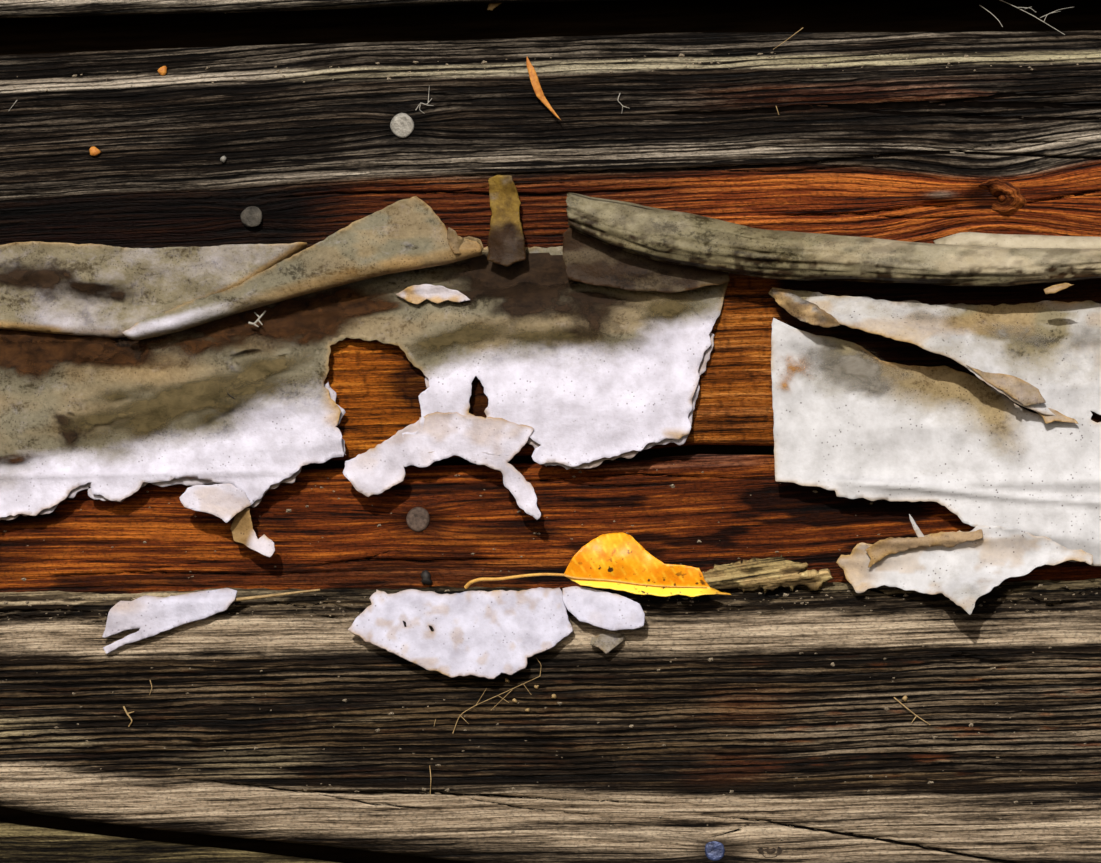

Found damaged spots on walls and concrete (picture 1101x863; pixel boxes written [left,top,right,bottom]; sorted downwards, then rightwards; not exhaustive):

damp [0,265,126,300]
damp [0,285,400,446]
damp [0,454,31,463]